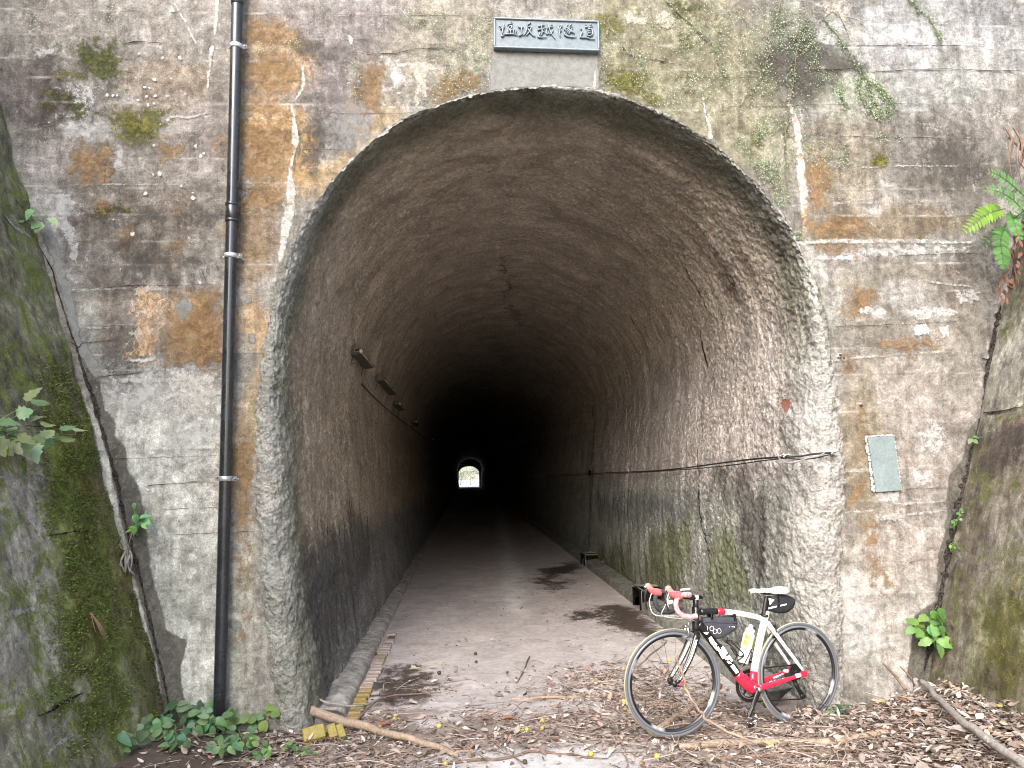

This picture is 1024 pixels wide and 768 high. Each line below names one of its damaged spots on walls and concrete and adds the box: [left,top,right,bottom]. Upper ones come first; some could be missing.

corrosion [67,136,115,214]
corrosion [207,16,302,221]
damp [278,66,305,263]
damp [780,102,808,230]
corrosion [795,146,872,260]
corrosion [122,282,223,375]
damp [302,509,375,690]